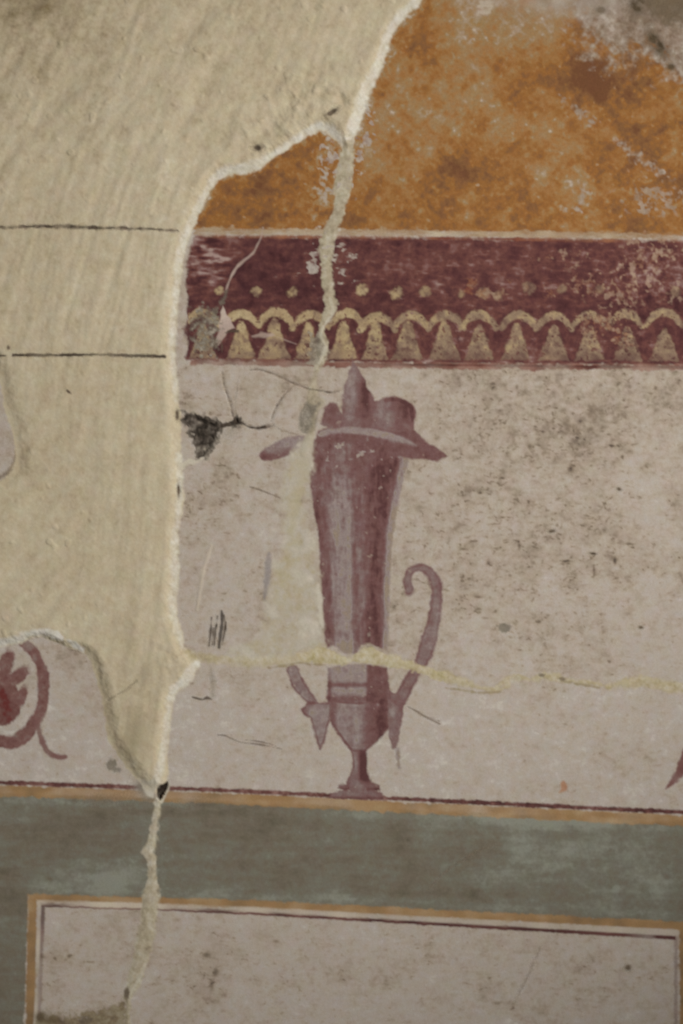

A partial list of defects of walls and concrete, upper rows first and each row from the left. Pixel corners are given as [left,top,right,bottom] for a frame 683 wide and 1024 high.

spalling [321,104,343,120]
spalling [248,141,266,155]
crack [211,100,382,437]
peeling [182,300,276,361]
spalling [173,406,246,505]
crack [180,643,683,697]
crack [122,802,163,1024]